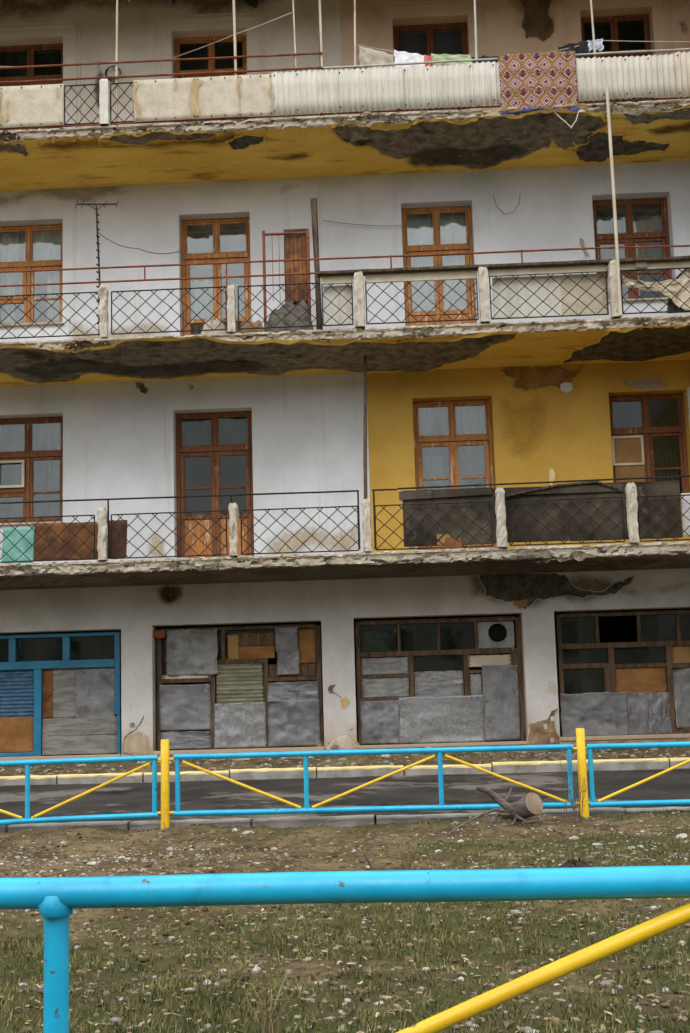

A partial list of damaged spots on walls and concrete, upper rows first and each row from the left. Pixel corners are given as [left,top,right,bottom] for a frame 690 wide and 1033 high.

peeling [518,0,556,44]
spalling [0,131,30,158]
spalling [328,100,690,171]
spalling [0,326,520,396]
spalling [499,315,690,393]
peeling [460,548,668,610]